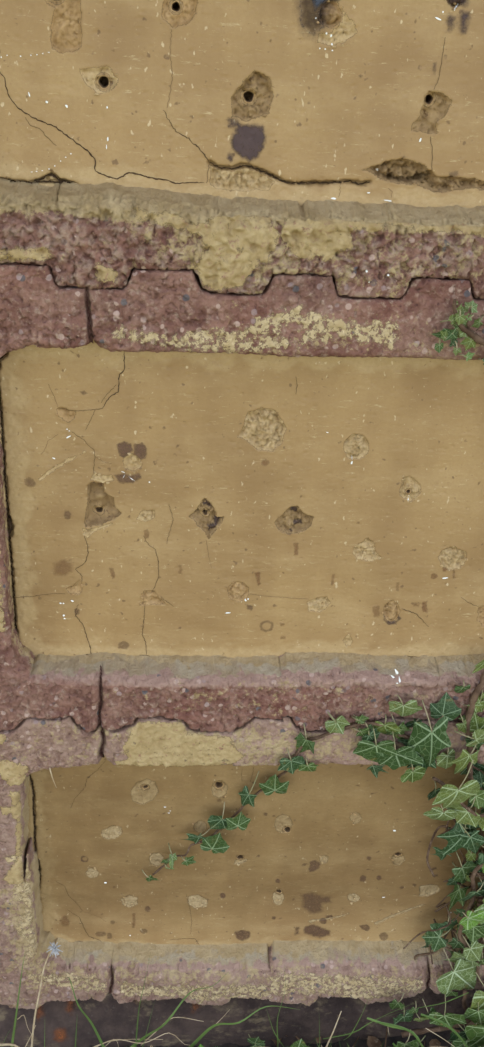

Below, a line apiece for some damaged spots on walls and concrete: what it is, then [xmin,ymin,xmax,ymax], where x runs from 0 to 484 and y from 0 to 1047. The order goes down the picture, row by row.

crack [0,30,393,197]
water stain [228,119,265,161]
spalling [363,156,484,193]
crack [85,288,93,343]
crack [41,355,125,471]
crack [0,394,104,804]